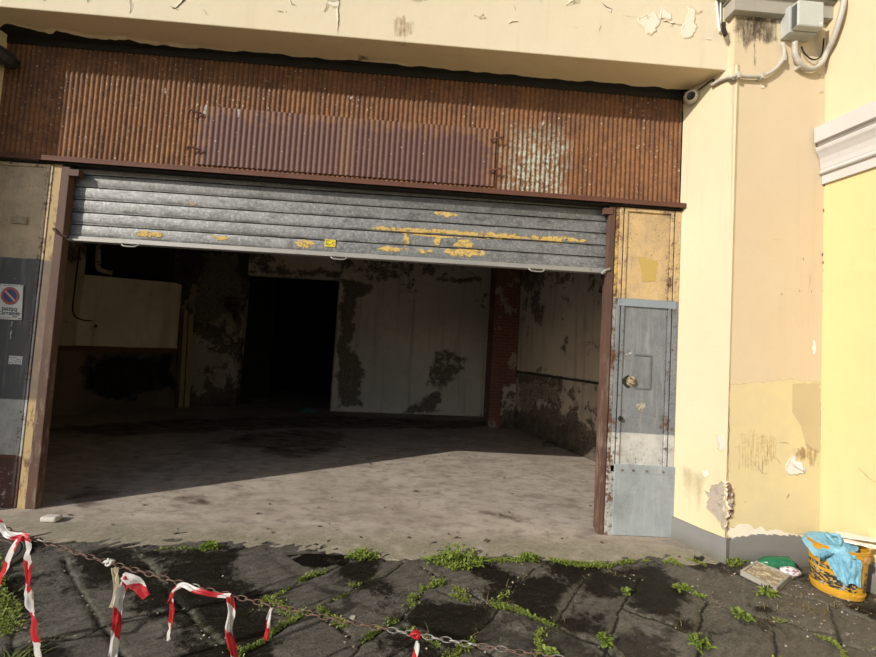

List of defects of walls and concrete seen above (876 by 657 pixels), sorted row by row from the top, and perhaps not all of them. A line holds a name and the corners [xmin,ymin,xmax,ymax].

peeling [637,6,672,36]
peeling [681,6,698,39]
leakage [737,17,776,44]
peeling [785,454,806,476]
spalling [703,470,803,538]